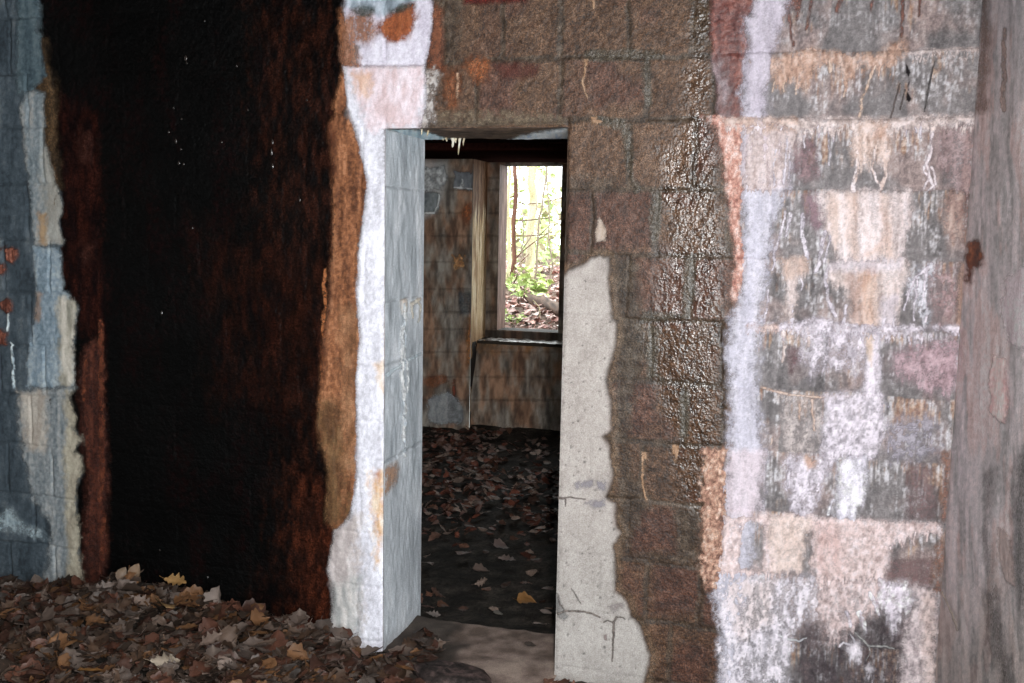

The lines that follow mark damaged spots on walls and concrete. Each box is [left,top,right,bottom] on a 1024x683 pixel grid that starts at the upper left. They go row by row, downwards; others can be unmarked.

efflorescence [850,118,892,192]
efflorescence [886,114,975,243]
leakage [780,213,809,334]
leakage [814,187,913,273]
efflorescence [824,257,924,345]
efflorescence [903,263,960,337]
corrosion [964,240,984,283]
leakage [761,316,885,522]
spalling [575,480,606,508]
crack [557,588,626,662]
leakage [796,575,890,683]
leakage [868,578,940,683]